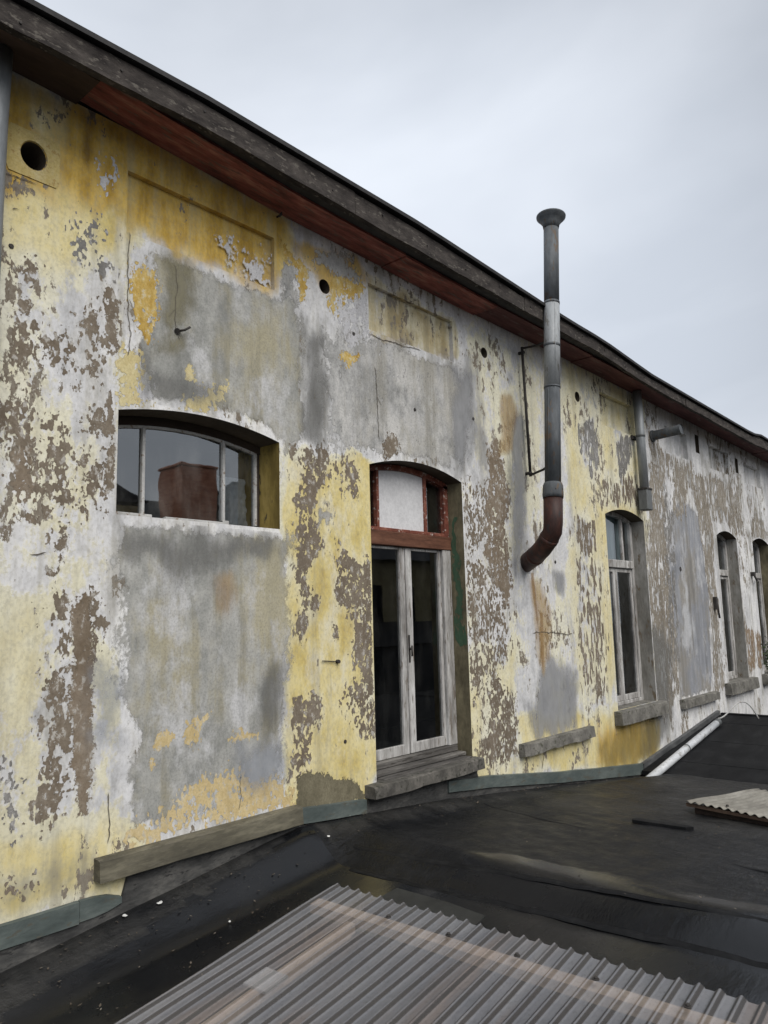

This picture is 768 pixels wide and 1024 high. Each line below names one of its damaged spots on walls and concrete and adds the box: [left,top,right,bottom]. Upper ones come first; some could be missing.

damp [164,258,192,326]
peeling [215,234,301,305]
damp [305,339,324,441]
damp [453,368,471,461]
peeling [0,208,125,848]
peeling [286,439,375,740]
peeling [461,436,521,771]
peeling [575,416,768,722]
peeling [275,686,323,784]